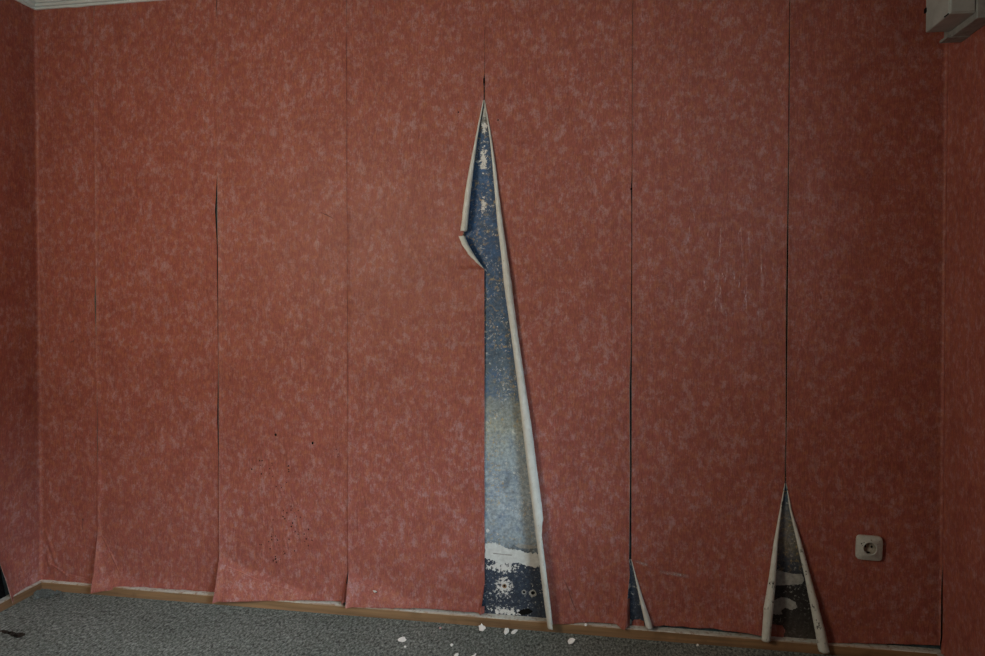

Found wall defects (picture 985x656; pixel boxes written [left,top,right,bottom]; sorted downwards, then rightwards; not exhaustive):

flaking render [462,83,548,618]
flaking render [627,342,658,627]
flaking render [772,150,816,639]